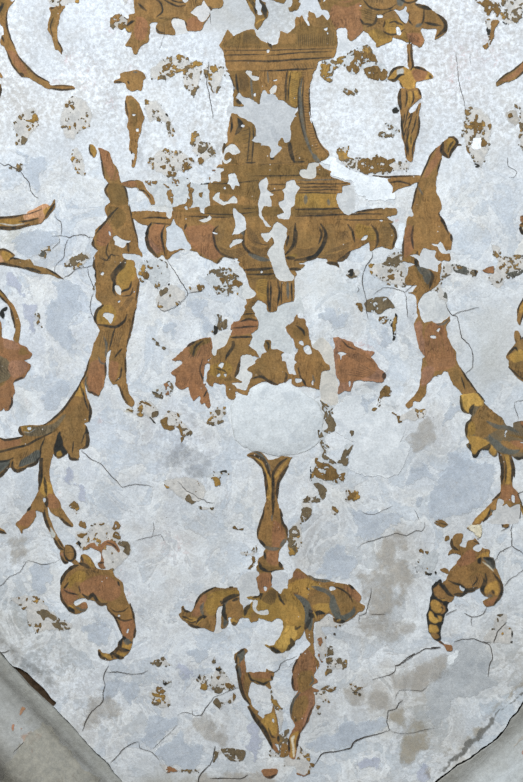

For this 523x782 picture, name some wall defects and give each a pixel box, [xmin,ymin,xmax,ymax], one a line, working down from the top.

peeling [320,27,389,82]
peeling [226,85,297,158]
peeling [144,131,246,251]
peeling [258,162,319,281]
peeling [113,235,305,390]
crack [357,253,416,317]
peeling [368,241,523,323]
crack [445,302,477,374]
crack [497,491,523,585]
crack [82,667,148,731]
crack [316,609,505,762]
crack [198,748,247,782]